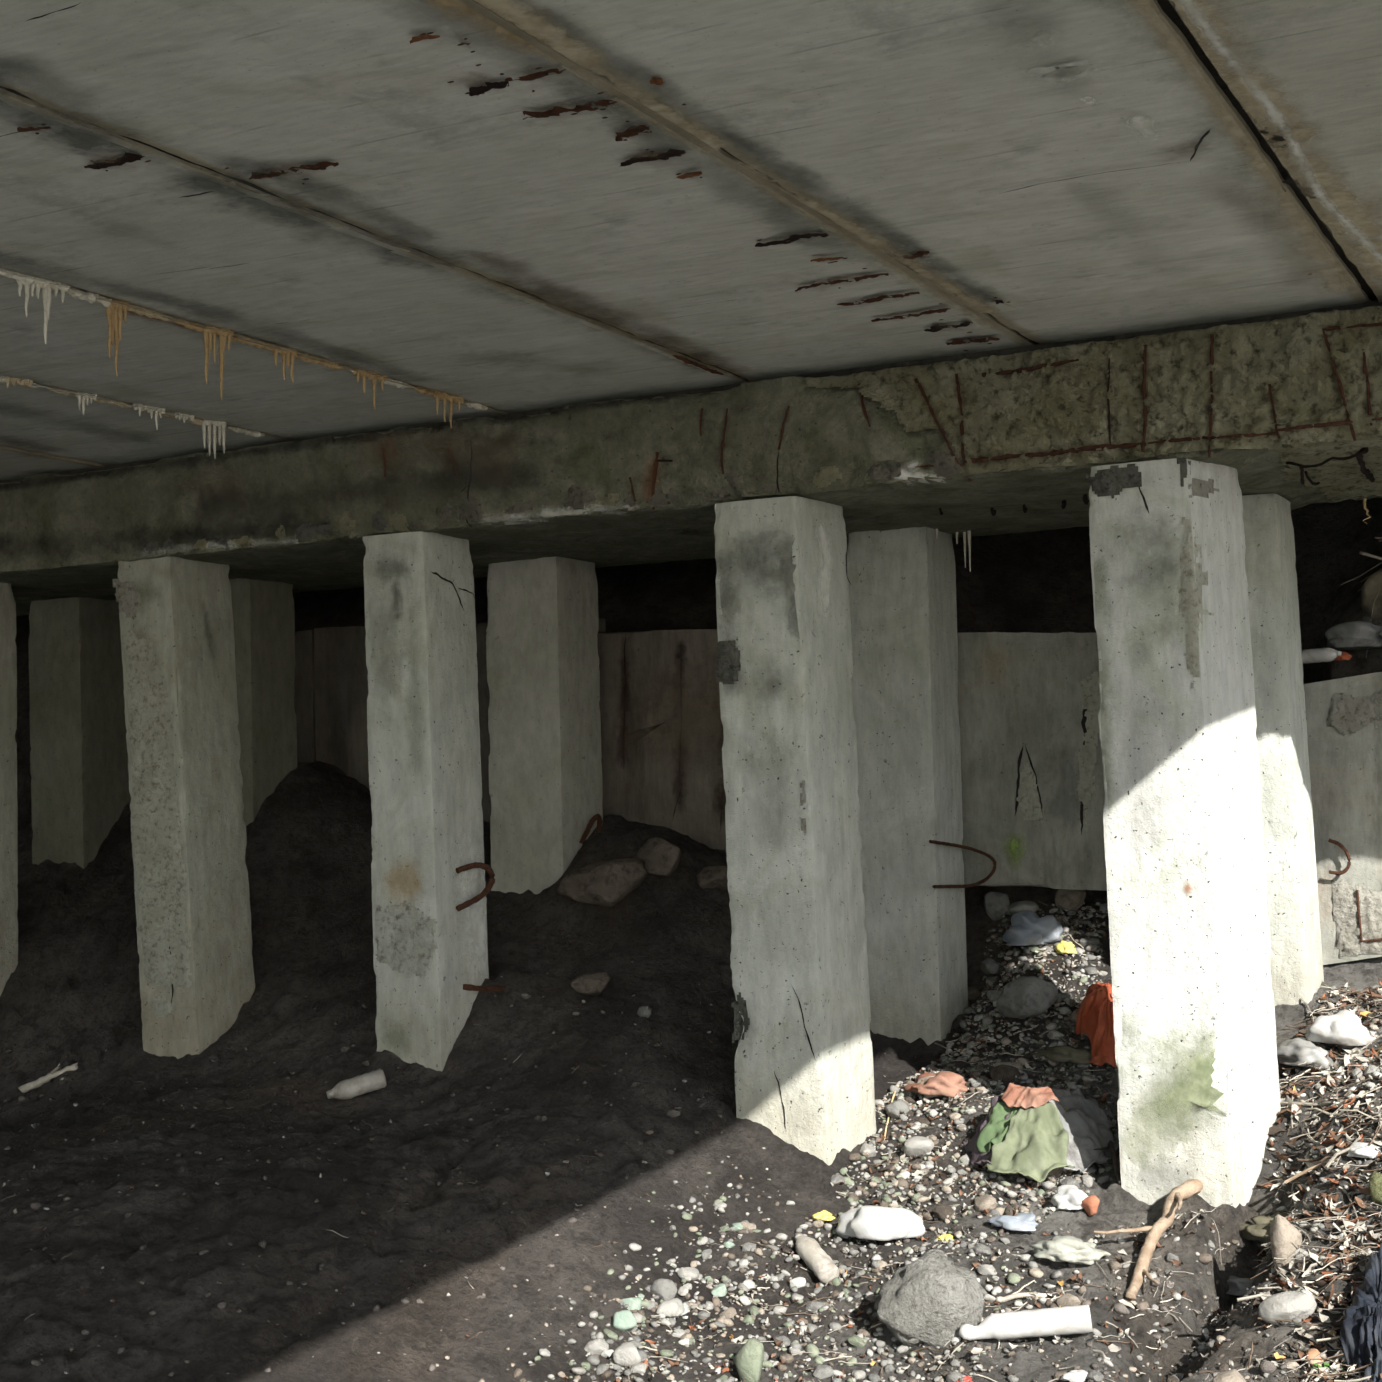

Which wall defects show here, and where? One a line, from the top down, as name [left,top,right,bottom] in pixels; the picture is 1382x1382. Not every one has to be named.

rust [448,67,566,96]
rust [84,152,151,171]
rust [522,92,702,179]
damp [1168,0,1382,292]
damp [0,268,435,396]
rust [795,251,1000,351]
damp [0,375,711,455]
spalling [804,306,1382,509]
peeling [1178,517,1214,688]
crack [1015,745,1044,822]
crack [1075,672,1100,835]
spalling [1332,880,1382,958]